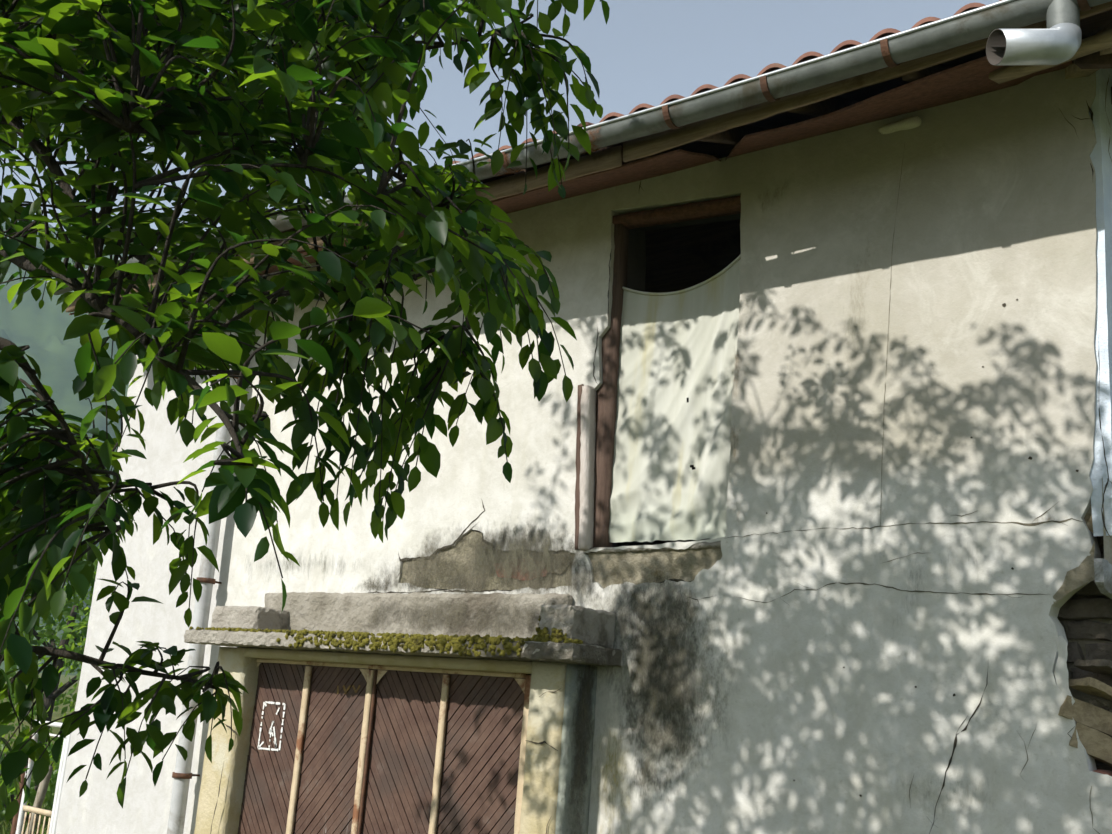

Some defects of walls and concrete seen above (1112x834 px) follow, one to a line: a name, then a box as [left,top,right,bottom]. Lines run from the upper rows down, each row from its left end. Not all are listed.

crack [728,145,1112,538]
peeling [400,530,722,591]
crack [689,552,1049,604]
spalling [1053,479,1112,604]
water stain [622,590,696,752]
peeling [1054,635,1075,705]
crack [926,672,988,834]